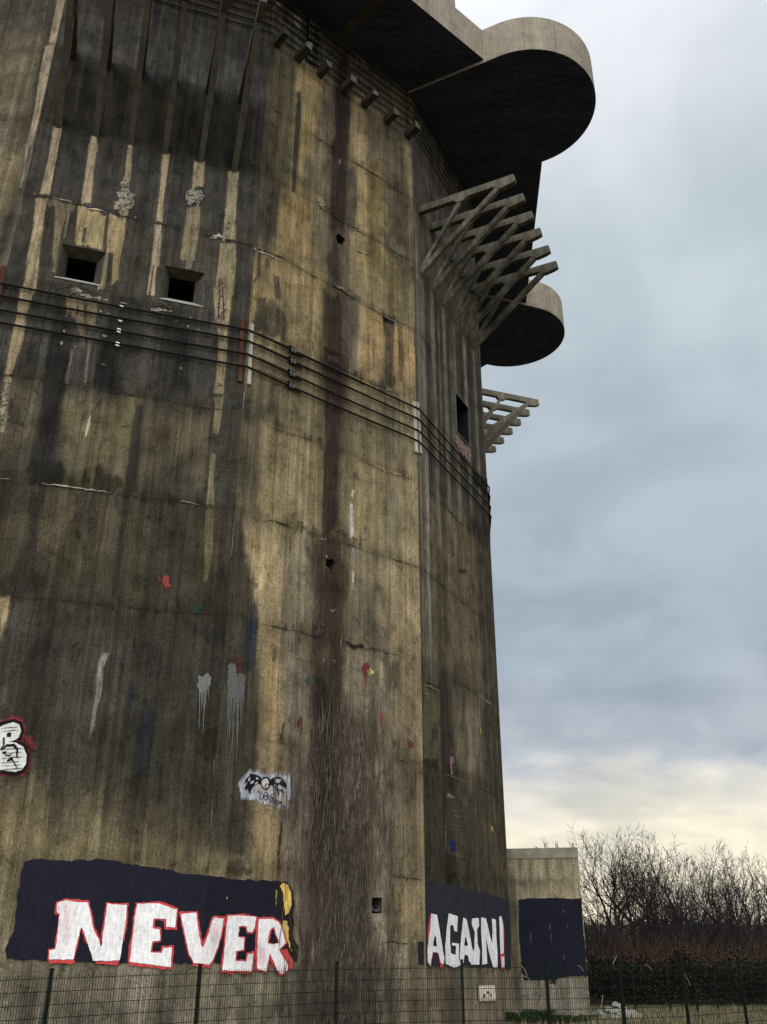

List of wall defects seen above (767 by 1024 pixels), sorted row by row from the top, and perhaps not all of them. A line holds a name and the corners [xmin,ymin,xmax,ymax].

damp [292,92,301,192]
damp [331,51,368,232]
spalling [113,181,136,214]
spalling [185,188,205,208]
damp [309,244,359,804]
crack [340,638,400,656]